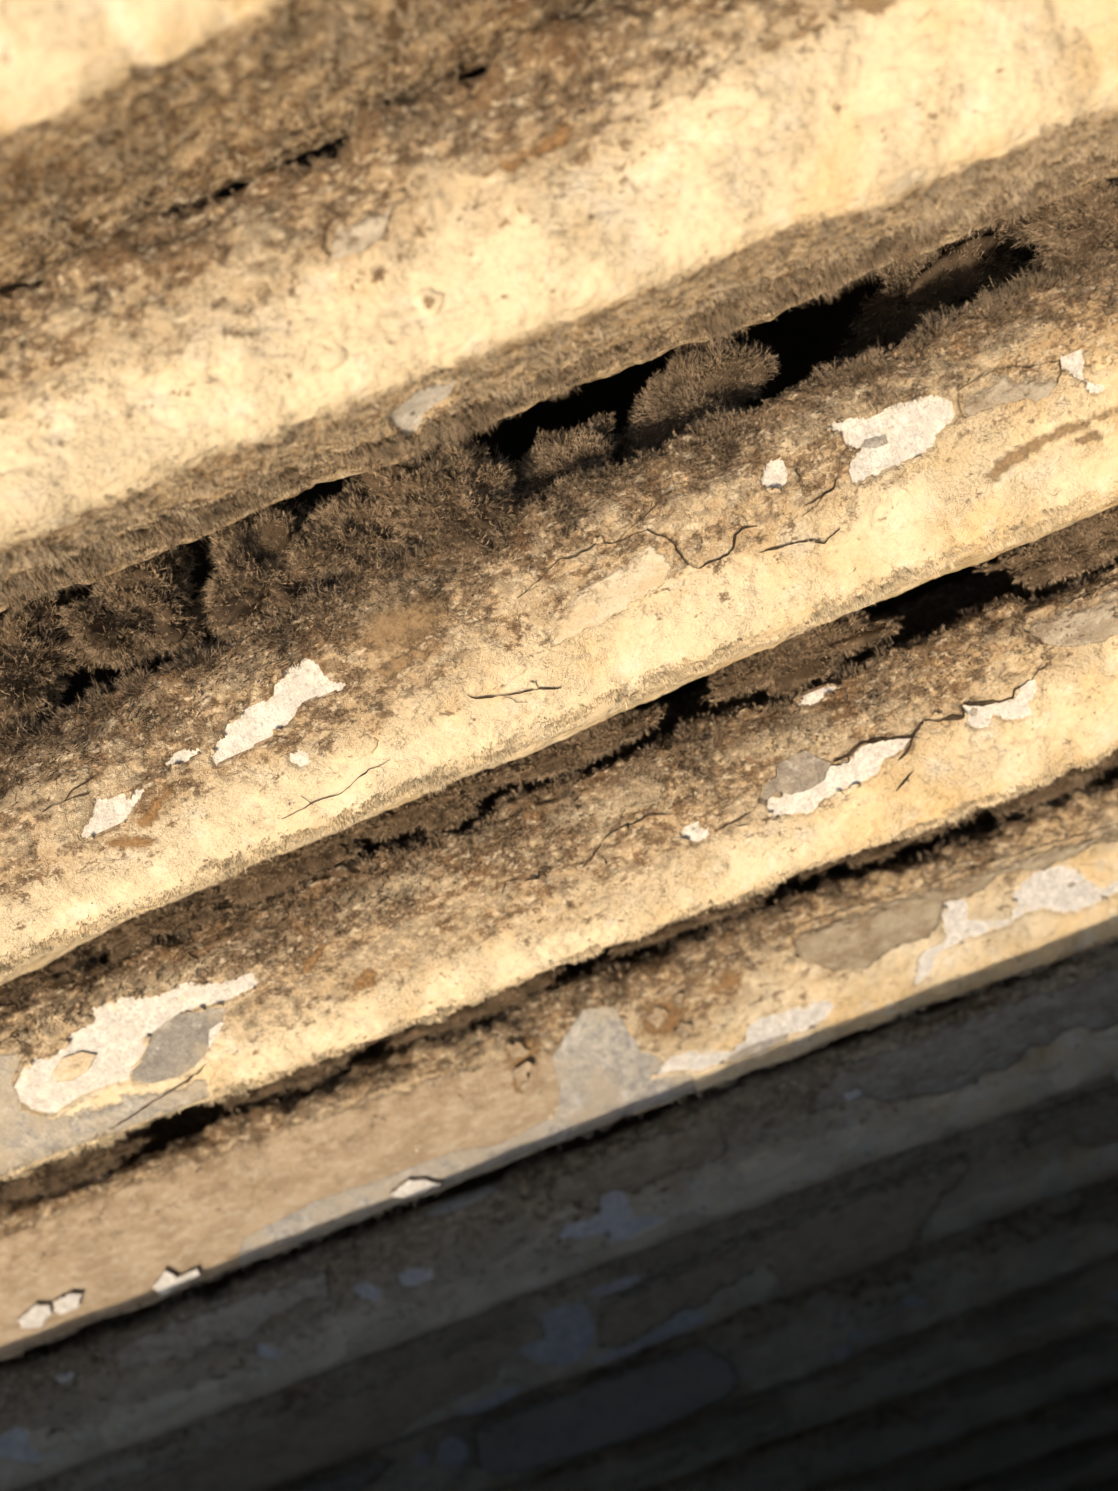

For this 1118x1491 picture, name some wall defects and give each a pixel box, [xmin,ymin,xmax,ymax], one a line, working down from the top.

peeling [826,395,955,483]
crack [517,450,845,598]
peeling [166,658,346,769]
peeling [963,679,1037,729]
peeling [761,739,910,820]
peeling [913,865,1118,984]
peeling [14,972,259,1113]
peeling [228,999,839,1266]